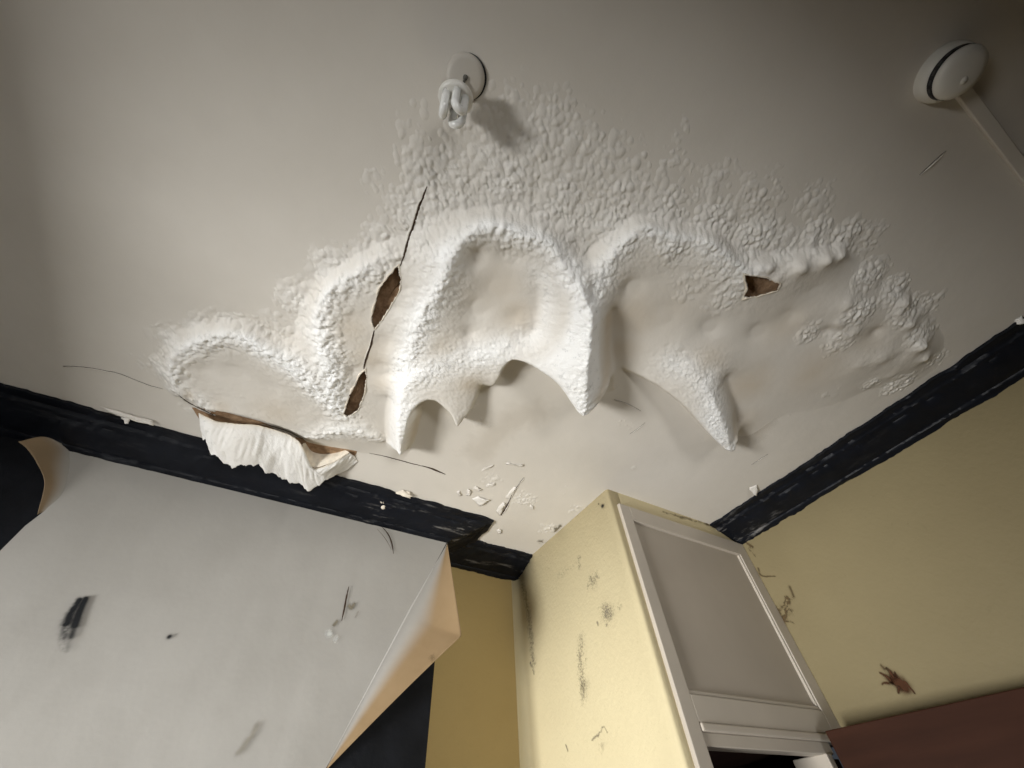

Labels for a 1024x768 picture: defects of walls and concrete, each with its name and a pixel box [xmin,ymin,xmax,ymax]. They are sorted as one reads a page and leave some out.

crack [399,187,427,266]
crack [363,330,374,373]
peeling [198,413,358,492]
peeling [457,483,516,515]